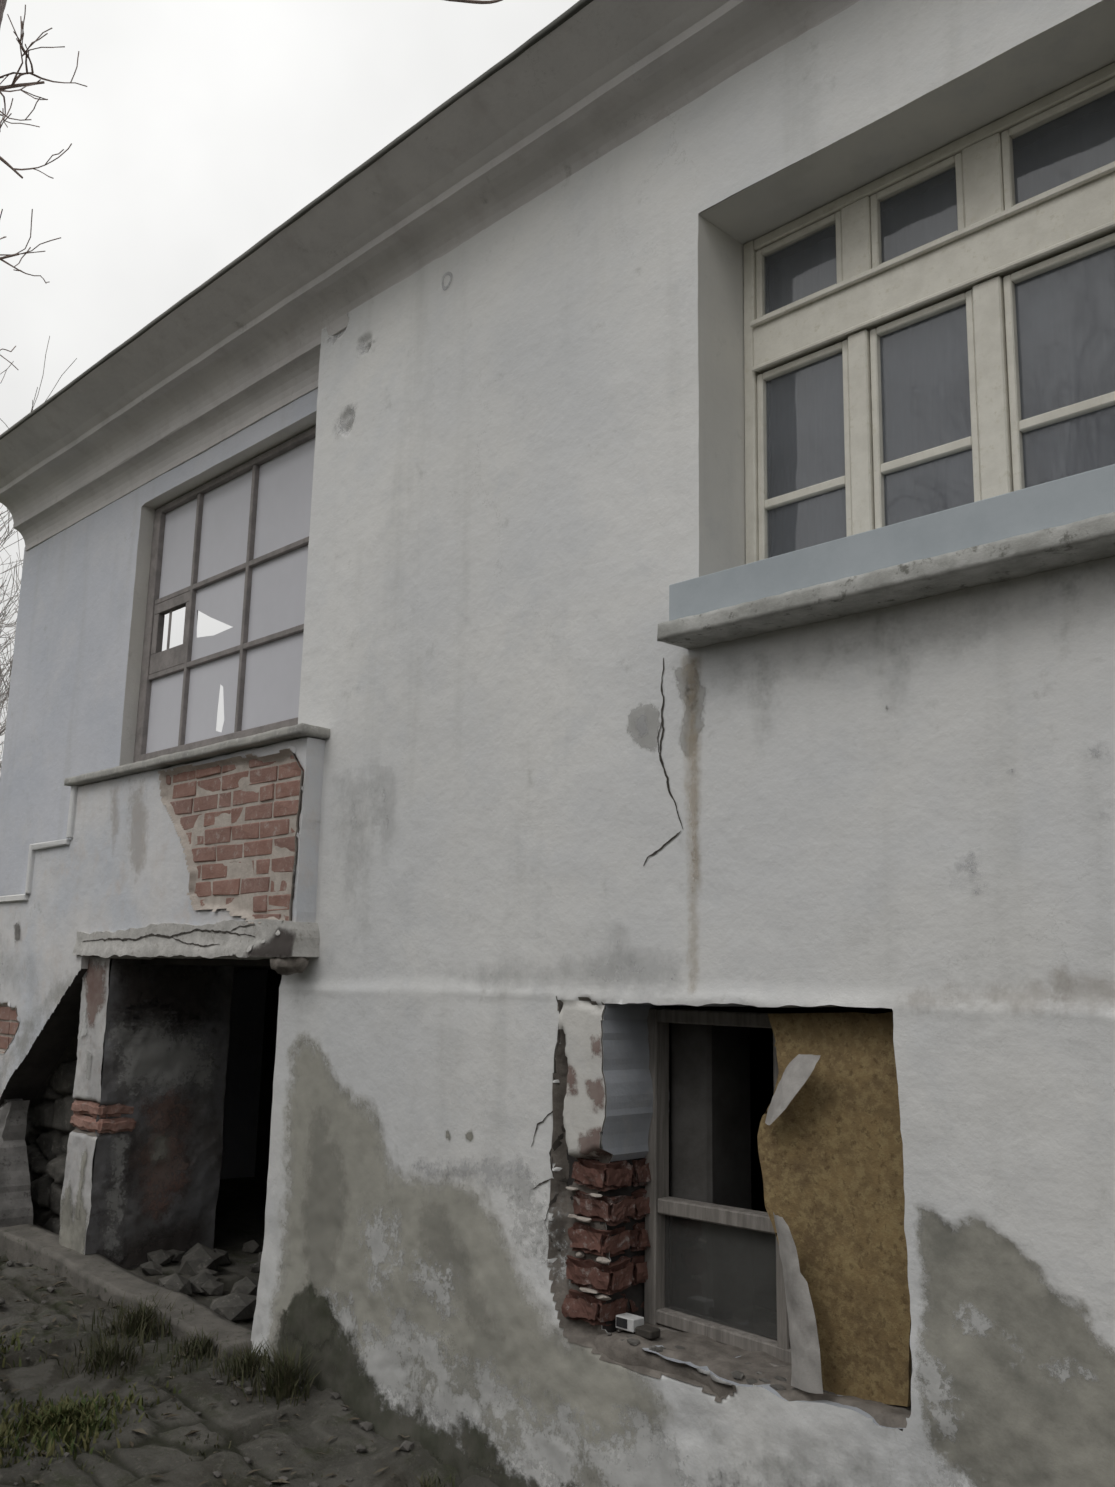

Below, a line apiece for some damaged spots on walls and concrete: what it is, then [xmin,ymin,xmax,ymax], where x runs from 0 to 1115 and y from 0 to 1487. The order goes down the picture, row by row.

flaking render [0,1001,21,1054]
peeling [70,961,213,1251]
crack [83,925,255,947]
flaking render [158,746,304,958]
flaking render [552,1000,611,1171]
crack [643,658,683,866]
water stain [269,1036,665,1454]
water stain [917,1208,1115,1487]